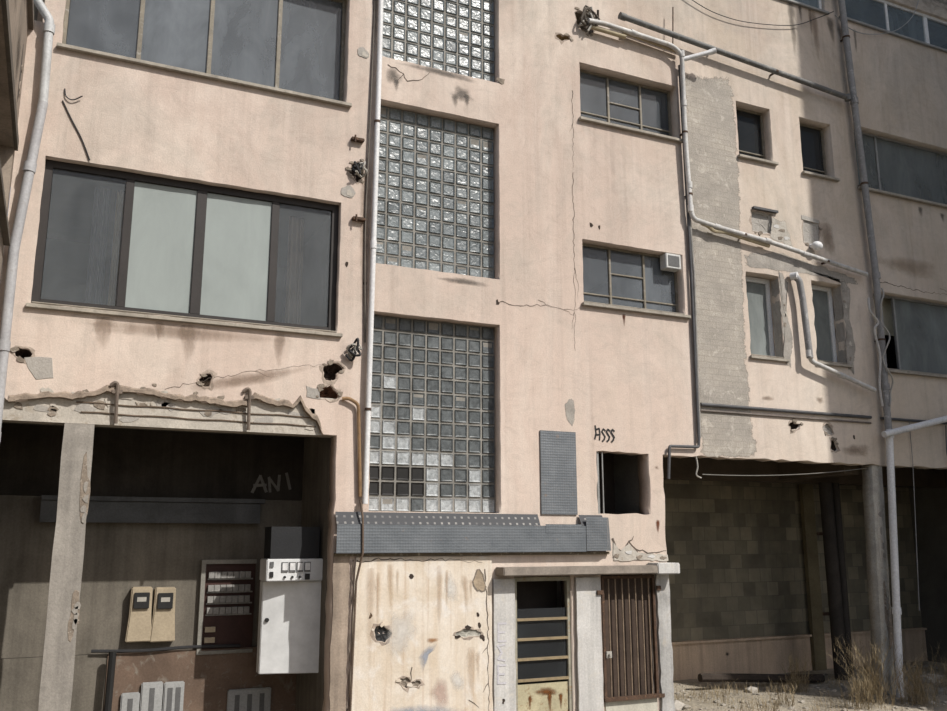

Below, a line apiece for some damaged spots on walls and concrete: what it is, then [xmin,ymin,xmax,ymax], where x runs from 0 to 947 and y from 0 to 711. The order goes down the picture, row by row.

crack [500,90,585,351]
flaking render [744,218,857,374]
spalling [316,359,346,403]
spalling [74,369,316,430]
hole [788,418,803,434]
spalling [823,421,841,453]
spalling [369,613,393,646]
spalling [453,612,485,641]
rust [529,688,562,707]